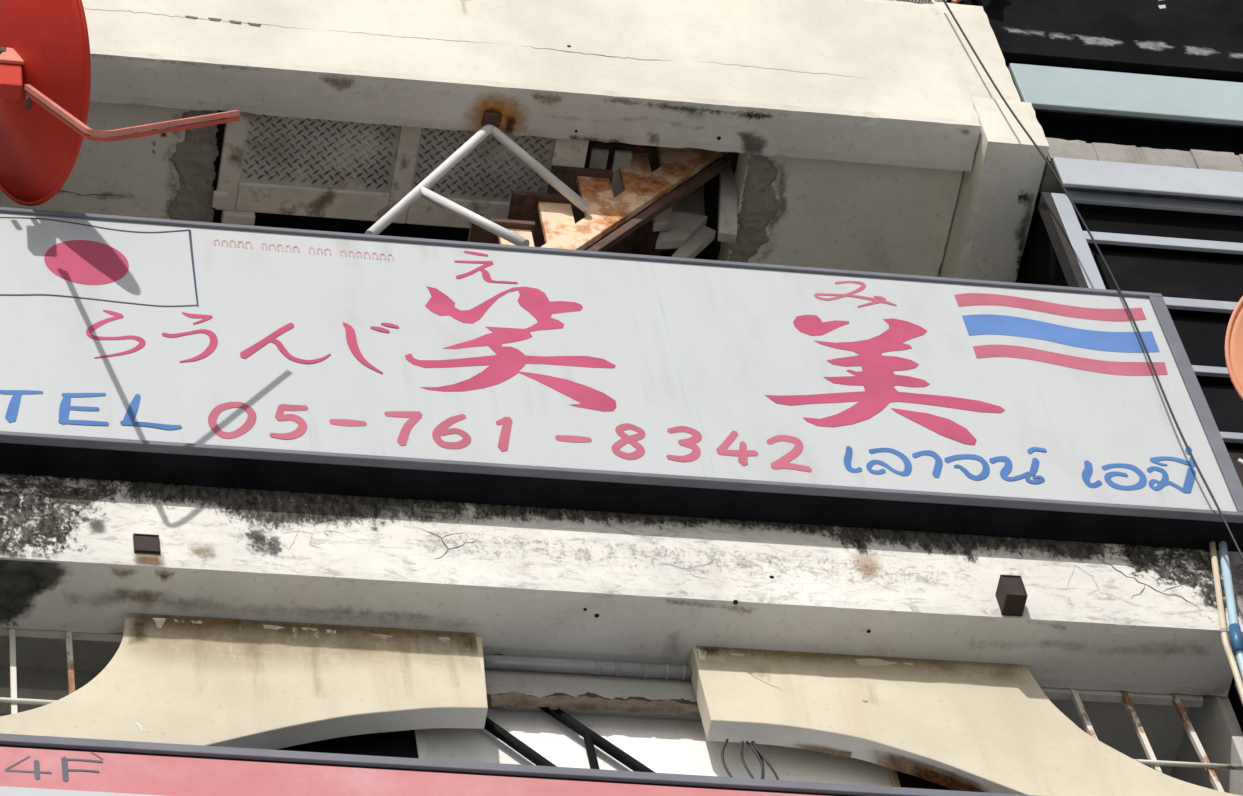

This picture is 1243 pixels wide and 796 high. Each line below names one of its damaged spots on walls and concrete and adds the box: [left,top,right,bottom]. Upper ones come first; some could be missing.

spalling [167,110,220,223]
corrosion [473,97,522,134]
spalling [728,154,779,263]
leakage [0,473,1227,626]
crack [1063,559,1199,608]
spalling [487,692,701,716]